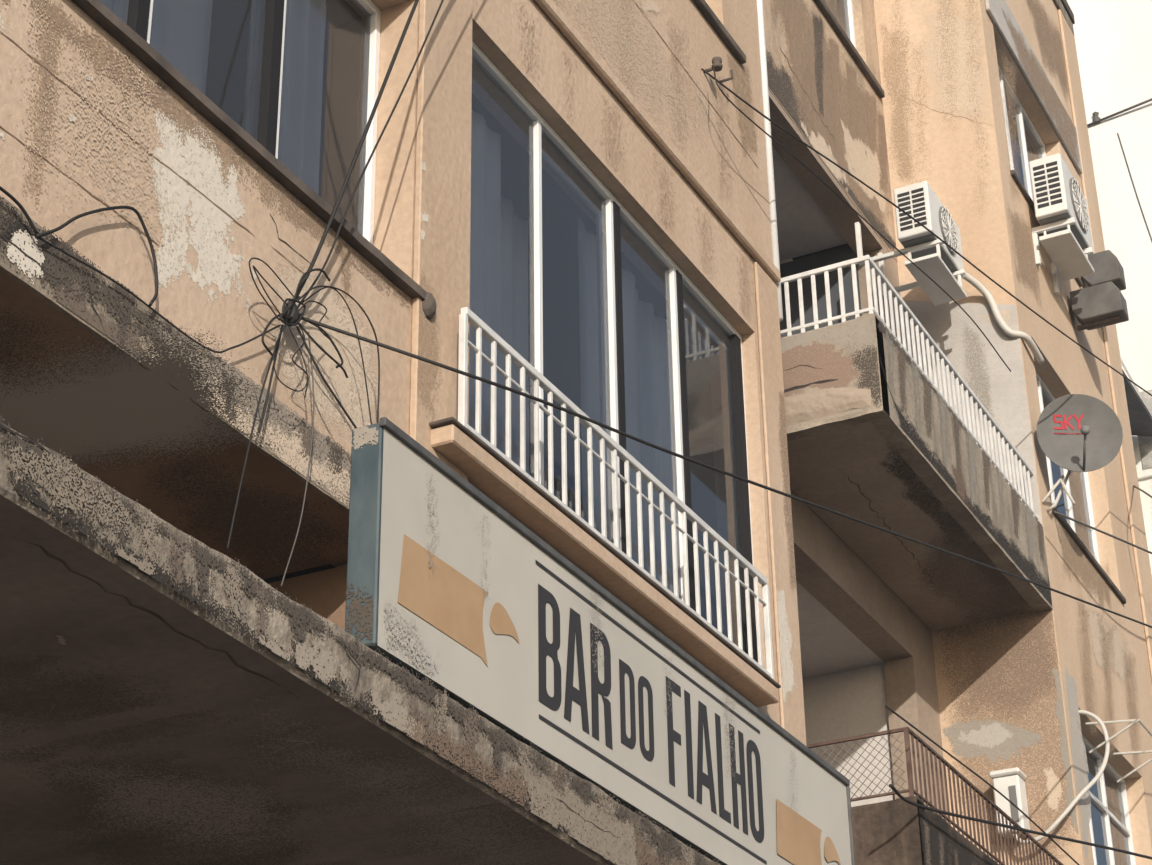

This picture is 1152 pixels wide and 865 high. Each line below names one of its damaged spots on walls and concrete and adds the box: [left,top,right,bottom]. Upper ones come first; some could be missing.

peeling [7,229,45,285]
peeling [149,111,258,316]
leakage [0,0,442,429]
leakage [709,54,758,198]
leakage [766,0,991,252]
leakage [1001,0,1080,308]
peeling [8,442,157,575]
crack [23,540,298,698]
spalling [257,635,350,691]
spalling [371,688,427,745]
leakage [781,309,1076,865]
leakage [1058,522,1144,784]